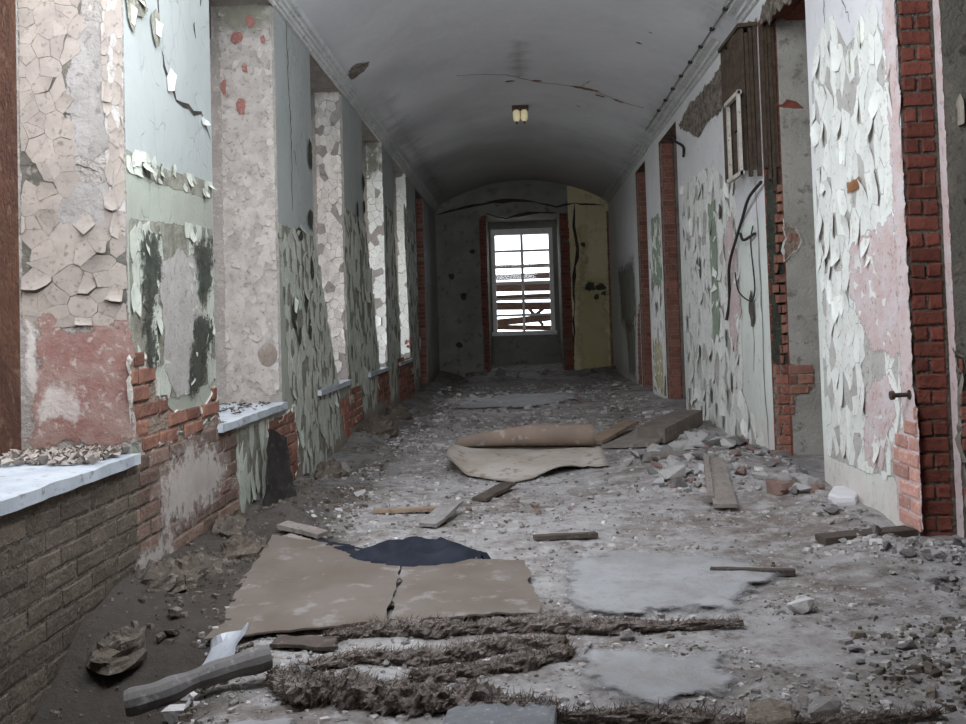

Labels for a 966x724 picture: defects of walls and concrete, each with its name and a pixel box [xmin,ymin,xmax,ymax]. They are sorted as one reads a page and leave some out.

crack [162,52,211,137]
crack [438,199,601,349]
spalling [636,0,966,538]